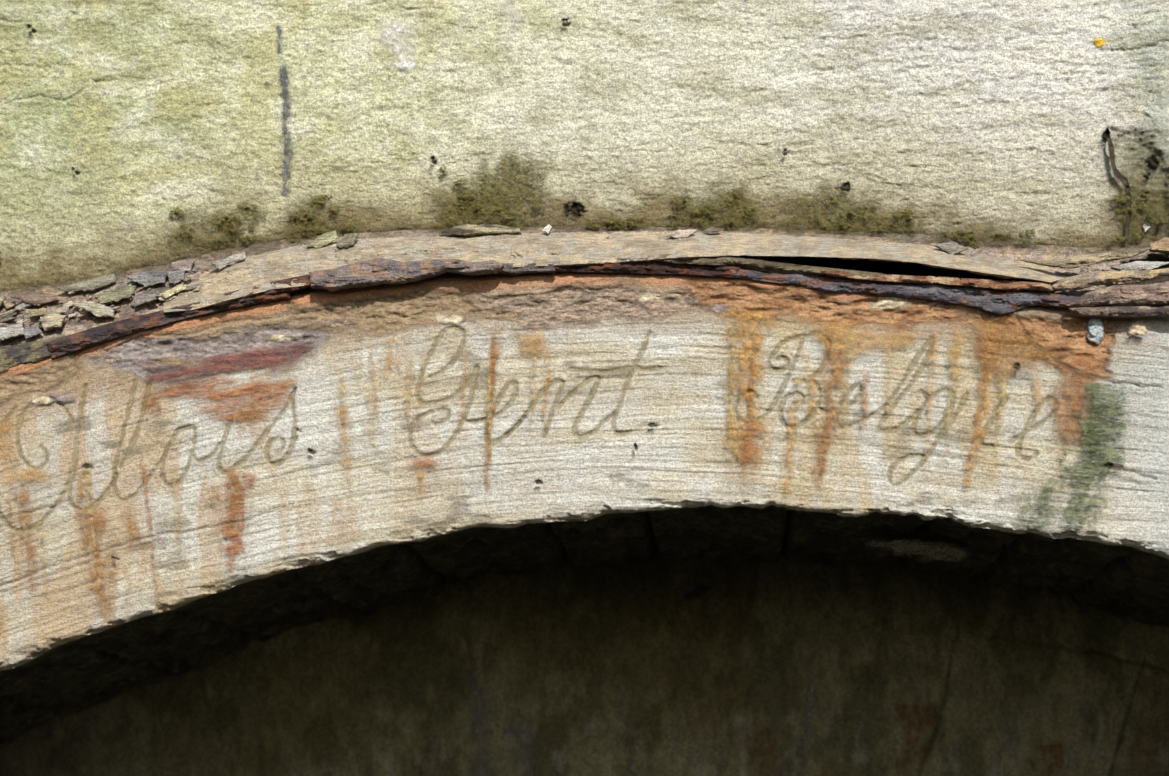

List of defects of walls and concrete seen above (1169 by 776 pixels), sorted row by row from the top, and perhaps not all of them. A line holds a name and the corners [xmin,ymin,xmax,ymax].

crack [1107,128,1131,243]
damp [1123,137,1169,237]
spalling [0,260,195,341]
rust [144,343,312,429]
spalling [306,230,358,249]
spalling [0,279,1115,404]
rust [726,311,771,470]
rust [785,322,916,493]
rust [819,269,1053,291]
rust [965,320,1098,486]
spalling [1129,323,1148,335]
rust [216,472,255,566]